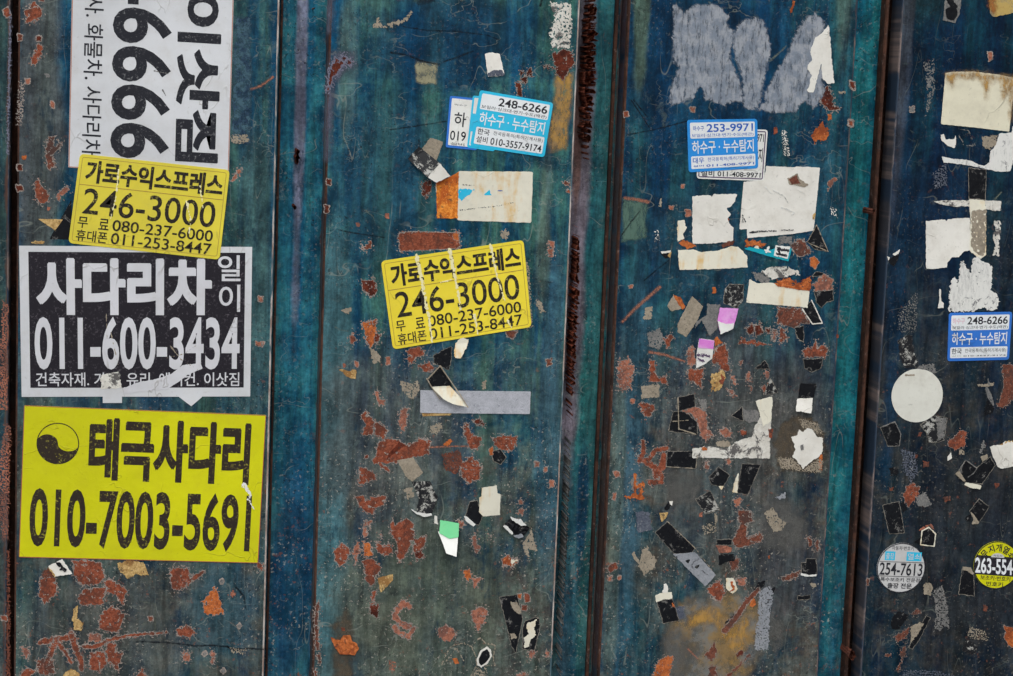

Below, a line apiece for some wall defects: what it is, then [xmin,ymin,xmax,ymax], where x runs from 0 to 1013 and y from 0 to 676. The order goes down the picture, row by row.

rust [2,6,31,155]
rust [777,454,823,473]
rust [517,592,531,612]